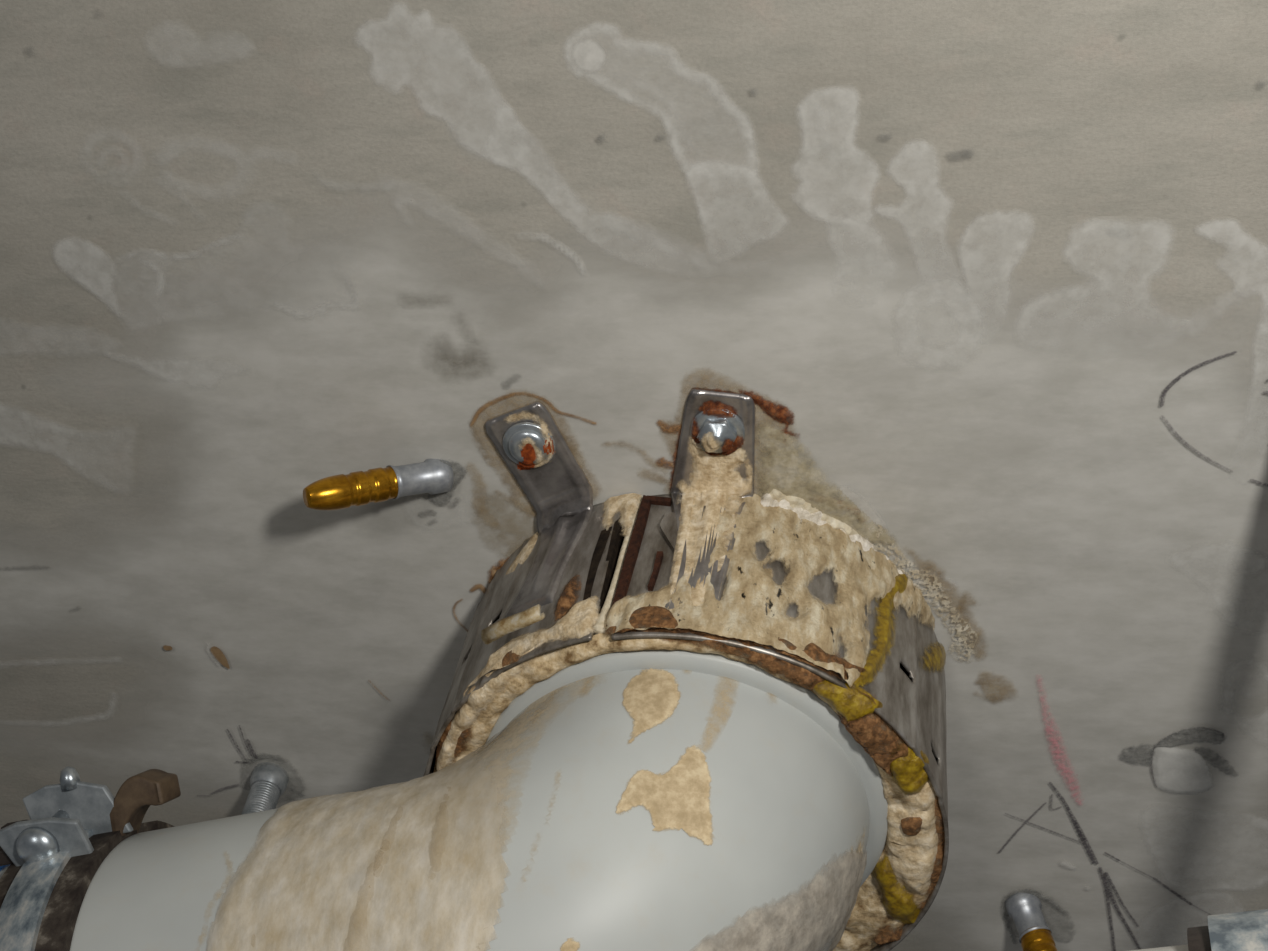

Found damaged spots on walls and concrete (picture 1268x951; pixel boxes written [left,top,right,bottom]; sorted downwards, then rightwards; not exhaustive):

water stain [359,6,586,229]
water stain [566,29,632,100]
water stain [649,45,767,226]
water stain [796,165,904,251]
water stain [0,213,1268,951]